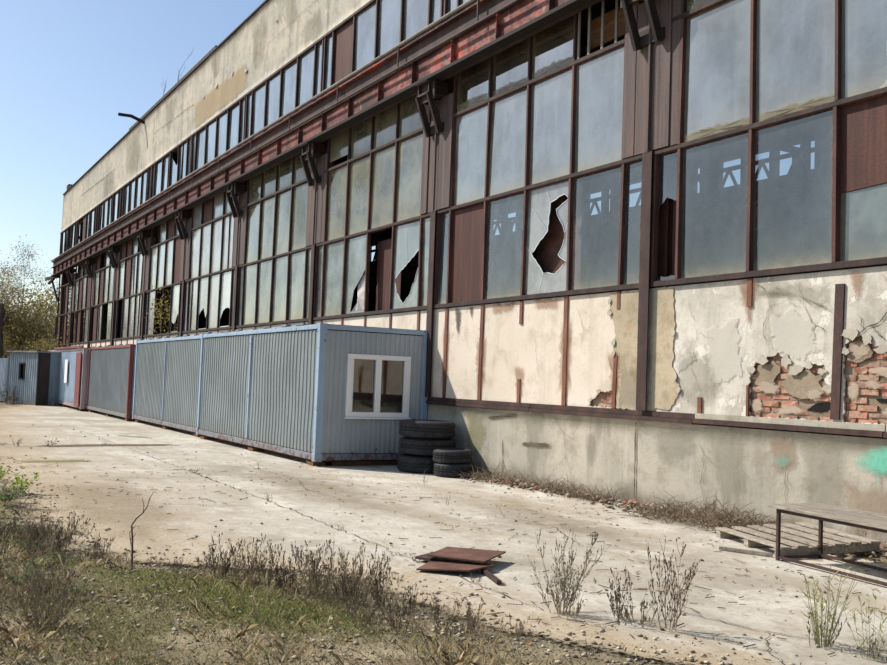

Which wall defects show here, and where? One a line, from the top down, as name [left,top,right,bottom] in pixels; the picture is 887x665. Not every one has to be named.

flaking render [195,66,247,127]
crack [756,284,825,343]
crack [858,312,887,340]
flaking render [747,354,833,421]
flaking render [842,329,887,425]